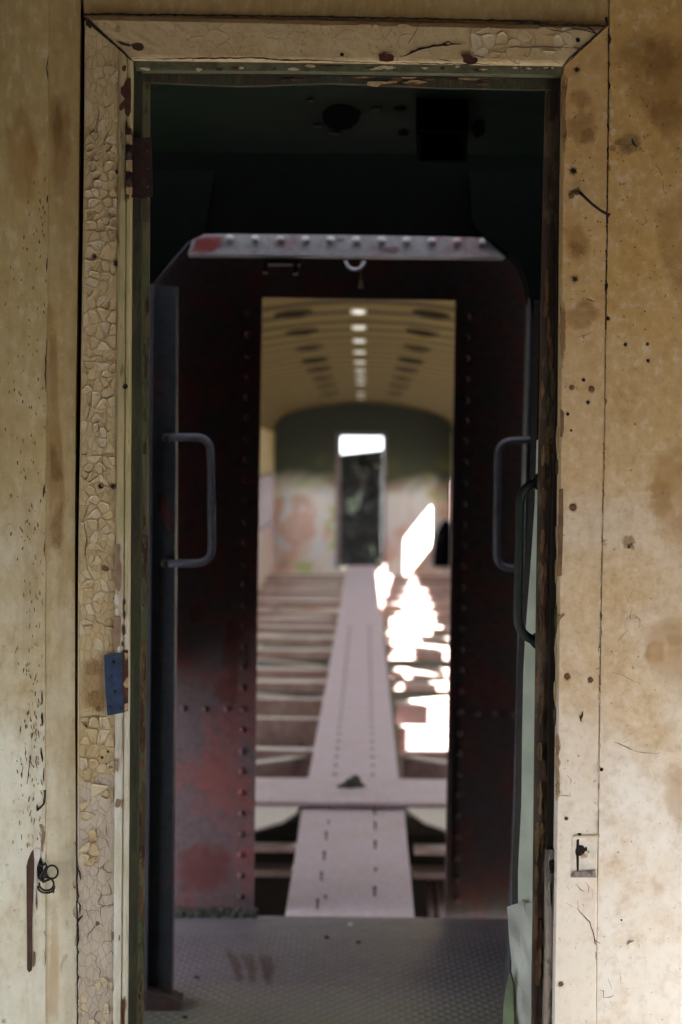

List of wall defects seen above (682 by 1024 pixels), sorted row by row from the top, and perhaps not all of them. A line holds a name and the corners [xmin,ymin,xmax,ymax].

peeling [173,24,415,71]
peeling [421,27,572,72]
corrosion [193,237,222,252]
peeling [72,66,126,653]
crack [83,13,673,812]
peeling [72,706,123,867]
peeling [75,978,125,1024]
crack [568,837,621,1024]